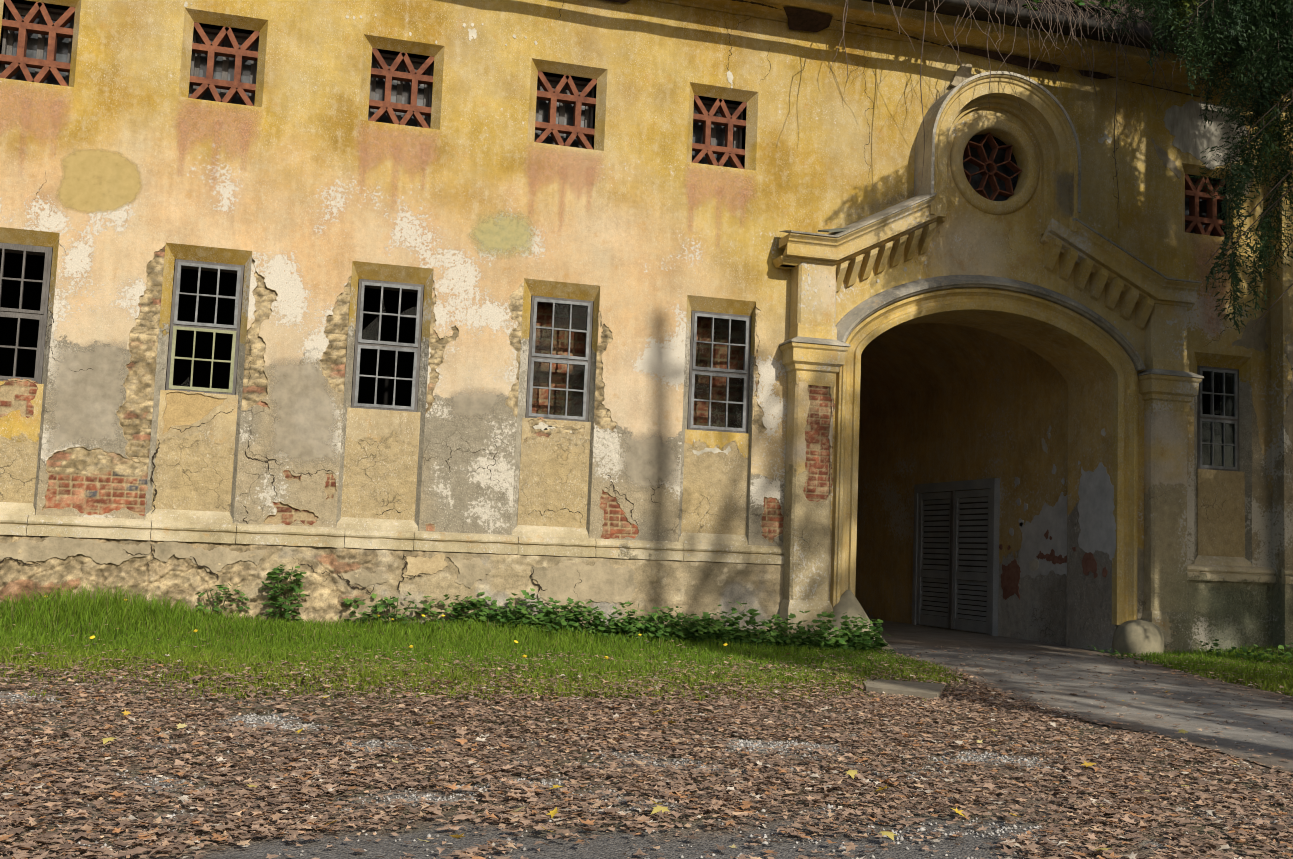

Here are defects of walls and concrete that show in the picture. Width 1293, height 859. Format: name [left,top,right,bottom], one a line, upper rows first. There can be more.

peeling [1151,99,1255,199]
flaking render [0,378,38,419]
flaking render [41,244,278,516]
crack [150,335,333,524]
flaking render [320,276,351,394]
flaking render [803,383,835,502]
flaking render [0,536,266,573]
flaking render [263,501,319,526]
flaking render [403,554,448,576]
flaking render [599,489,639,539]
flaking render [761,497,784,543]
flaking render [999,425,1116,600]